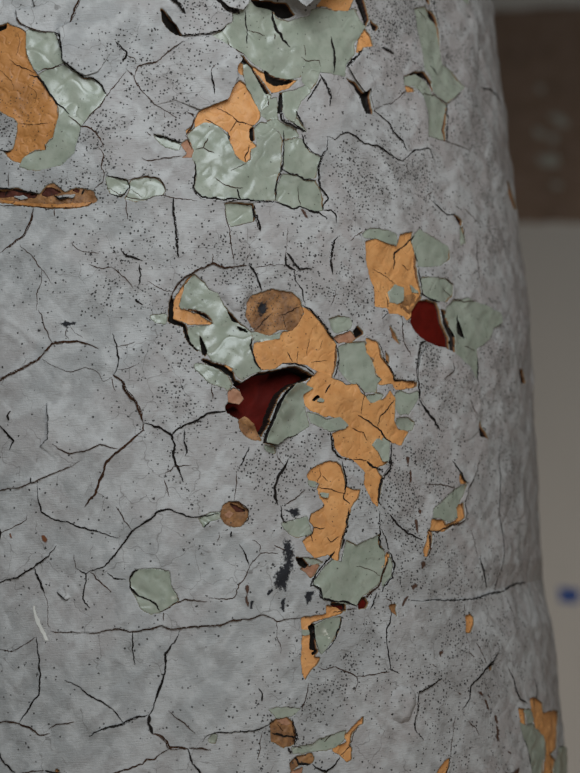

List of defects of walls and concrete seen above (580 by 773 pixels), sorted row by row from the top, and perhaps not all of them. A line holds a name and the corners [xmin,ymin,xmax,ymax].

peeling [0,0,117,171]
peeling [106,175,166,219]
crack [69,0,240,257]
peeling [139,0,472,259]
crack [326,209,338,273]
crack [327,90,436,170]
crack [0,209,311,773]
peeling [151,229,503,678]
crack [383,312,440,430]
crack [302,449,526,708]
peeling [269,707,363,773]
peeling [508,668,567,773]